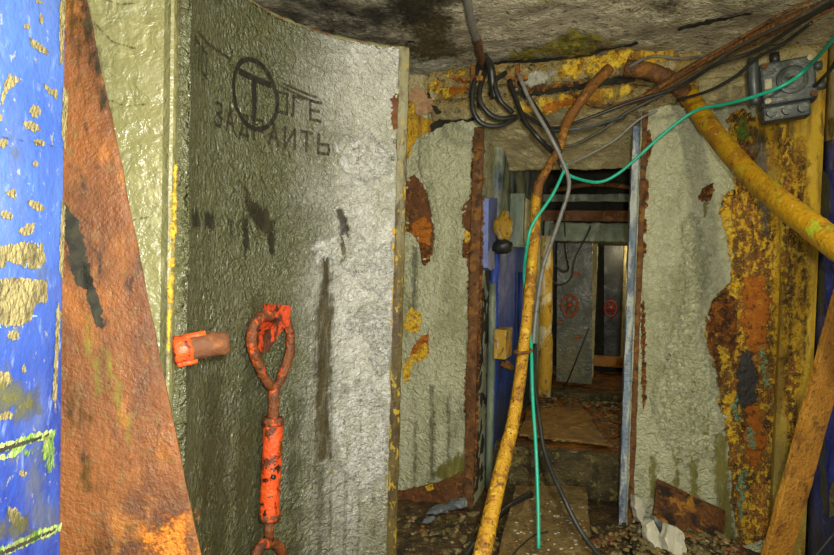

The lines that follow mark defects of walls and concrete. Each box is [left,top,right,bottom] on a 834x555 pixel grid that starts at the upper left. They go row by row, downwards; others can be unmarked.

peeling [0,73,19,121]
peeling [23,103,45,146]
leakage [276,0,467,99]
corrosion [725,107,811,206]
peeling [0,222,48,341]
corrosion [165,165,177,358]
leakage [0,383,40,421]
peeling [52,302,62,409]
leakage [314,257,334,460]
corrosion [698,172,811,546]
leakage [0,516,35,541]
corrosion [139,513,196,555]